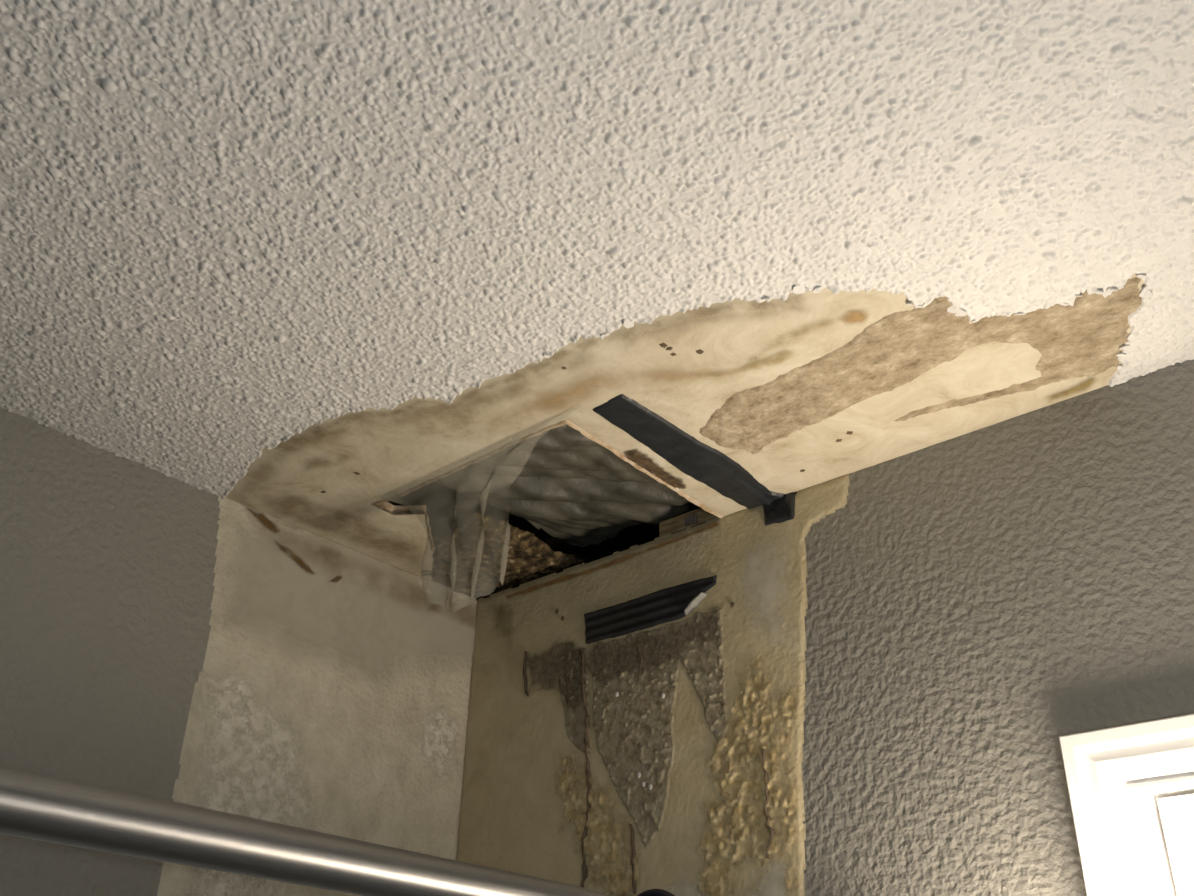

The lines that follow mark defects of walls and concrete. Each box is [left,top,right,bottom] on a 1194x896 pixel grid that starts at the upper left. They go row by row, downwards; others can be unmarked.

crack [522,651,530,697]
crack [565,647,592,888]
crack [629,823,637,894]
peeling [157,273,1153,896]